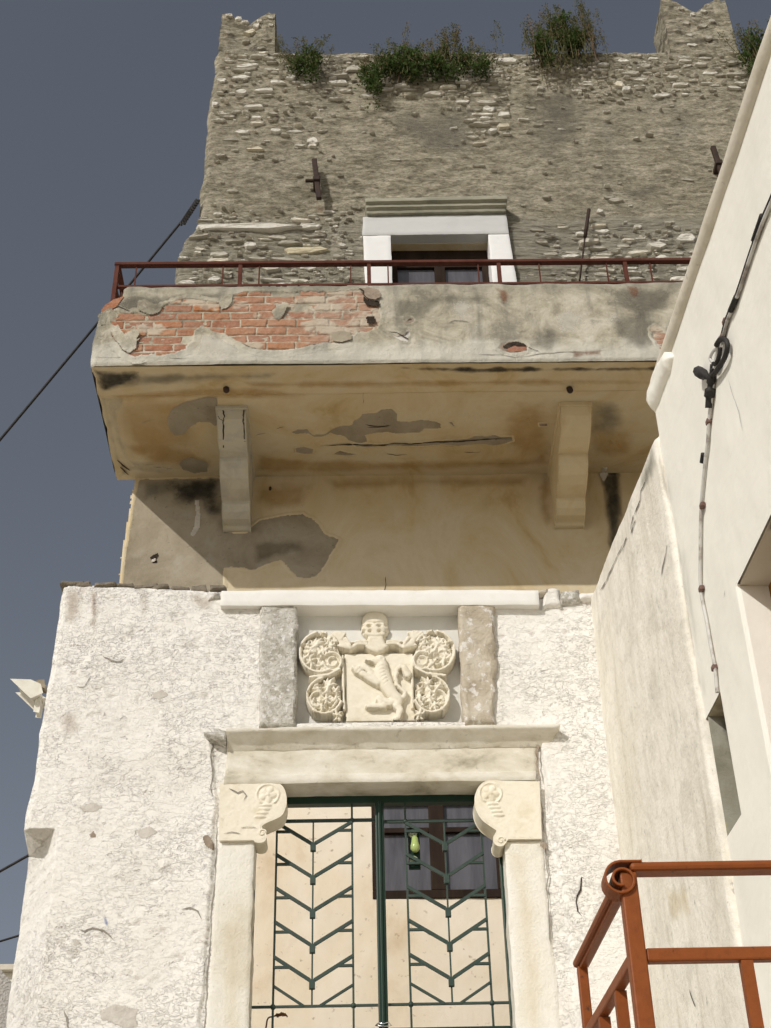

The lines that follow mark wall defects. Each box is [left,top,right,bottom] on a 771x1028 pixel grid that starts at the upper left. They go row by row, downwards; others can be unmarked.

flaking render [97,285,418,364]
spalling [493,339,538,357]
flaking render [167,397,218,435]
flaking render [287,406,445,456]
water stain [177,478,218,511]
flaking render [119,457,344,591]
water stain [600,467,620,543]
crack [535,744,551,944]
crack [575,877,583,915]